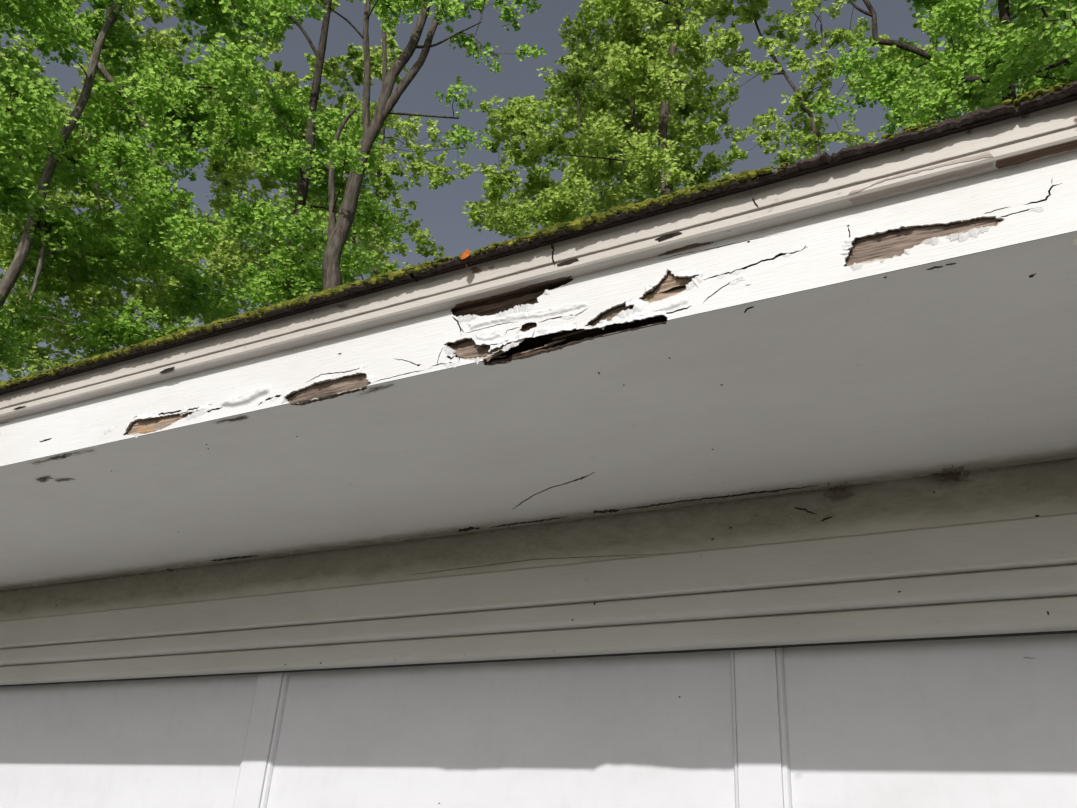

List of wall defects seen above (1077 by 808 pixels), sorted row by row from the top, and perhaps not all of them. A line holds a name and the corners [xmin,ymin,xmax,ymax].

crack [985,181,1062,217]
peeling [840,216,1005,271]
crack [655,233,807,314]
peeling [443,269,703,365]
peeling [281,366,375,406]
peeling [123,403,210,438]
mould [905,453,1077,501]
crack [459,472,595,532]
crack [593,485,833,521]
crack [209,554,259,562]
mould [0,481,886,611]